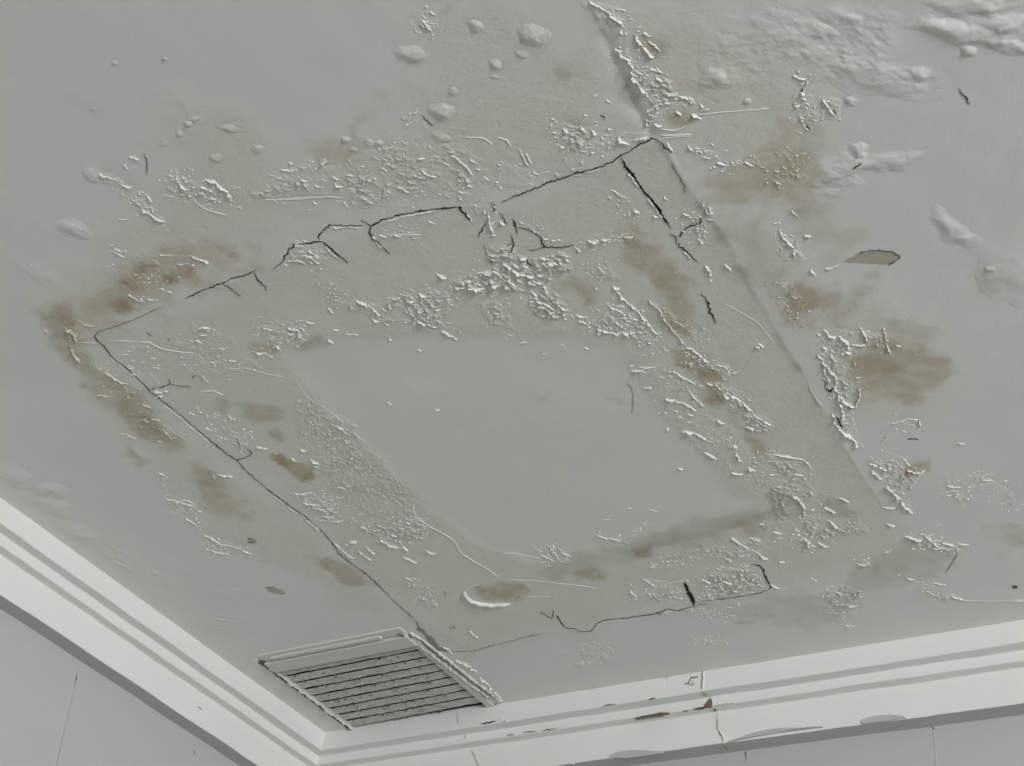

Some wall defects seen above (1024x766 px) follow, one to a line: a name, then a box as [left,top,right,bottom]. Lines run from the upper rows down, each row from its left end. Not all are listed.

damp [271,455,314,481]
crack [94,138,779,652]
peeling [98,0,869,604]
peeling [765,221,901,275]
peeling [767,282,925,514]